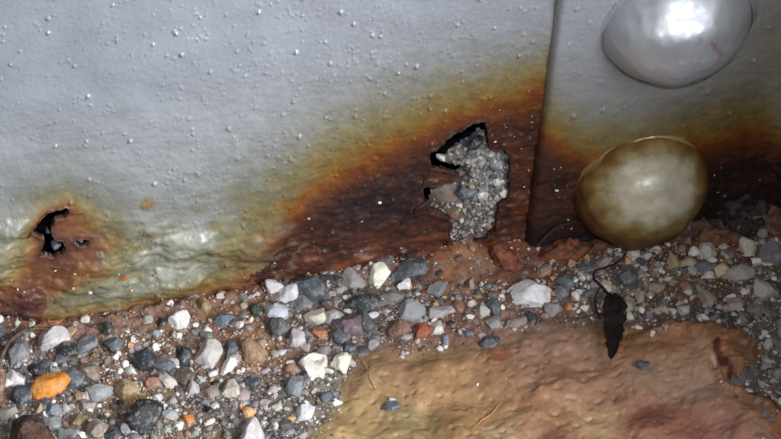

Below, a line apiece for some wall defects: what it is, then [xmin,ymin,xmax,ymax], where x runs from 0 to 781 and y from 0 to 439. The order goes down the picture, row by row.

rust [0,51,781,334]
rust [324,318,781,439]